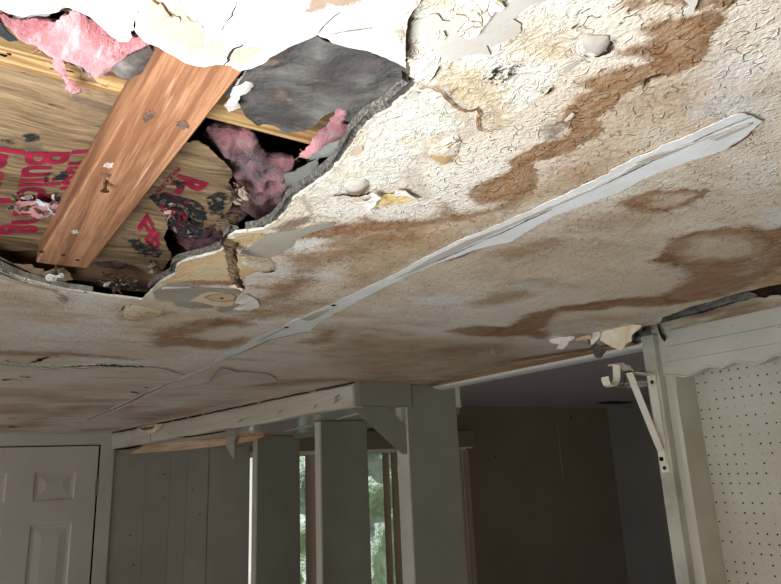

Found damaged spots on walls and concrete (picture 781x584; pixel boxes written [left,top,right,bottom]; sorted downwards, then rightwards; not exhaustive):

peeling [684,0,698,15]
crack [419,66,501,132]
crack [692,117,752,150]
peeling [148,0,611,313]
leakage [149,0,781,350]
crack [334,190,369,198]
leakage [128,239,161,258]
spalling [0,261,93,304]
leakage [504,345,609,361]
peeling [549,336,575,349]
peeling [587,324,641,358]
crack [0,357,356,434]